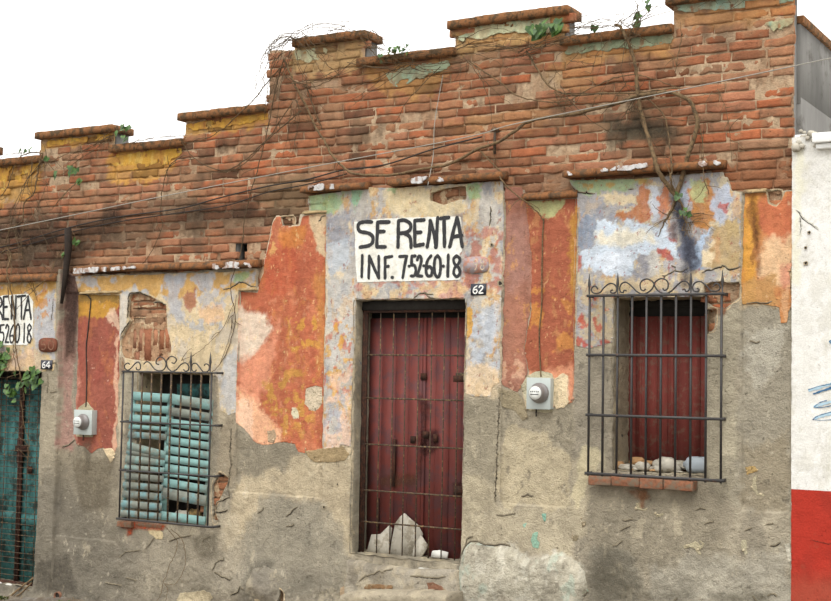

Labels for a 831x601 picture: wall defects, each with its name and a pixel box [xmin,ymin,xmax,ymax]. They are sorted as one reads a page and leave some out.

peeling [73,160,792,463]
flaking render [211,471,229,525]
crack [119,534,210,558]
crack [211,557,243,595]